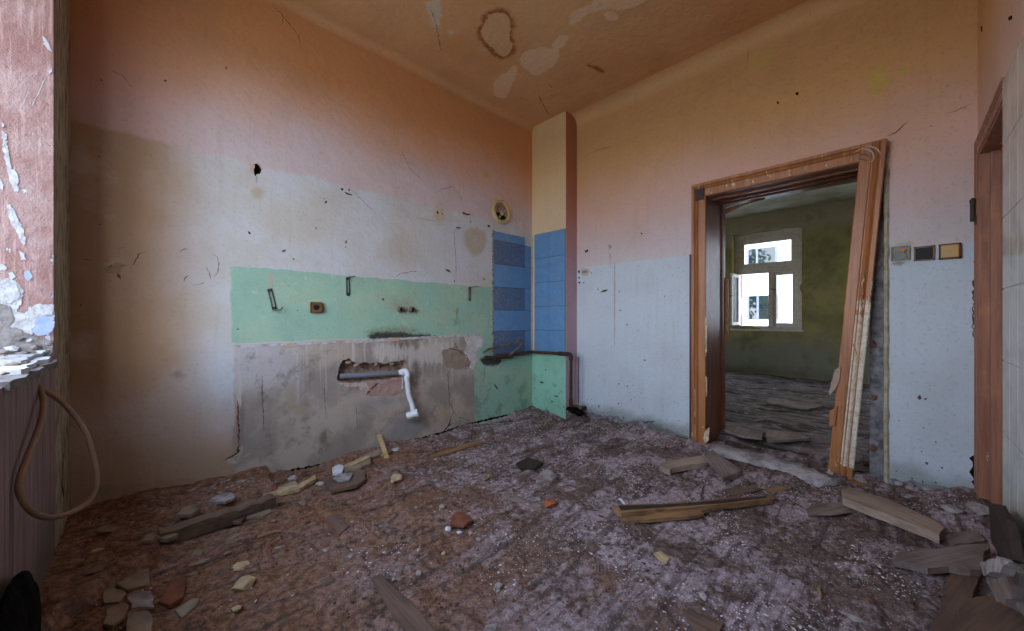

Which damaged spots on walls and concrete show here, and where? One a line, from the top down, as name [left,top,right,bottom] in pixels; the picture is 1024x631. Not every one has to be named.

damp [413,0,524,65]
peeling [489,0,657,101]
peeling [0,122,19,192]
peeling [0,204,55,356]
crack [225,380,264,460]
spalling [235,333,483,370]
spalling [337,358,407,397]
crack [415,341,507,439]